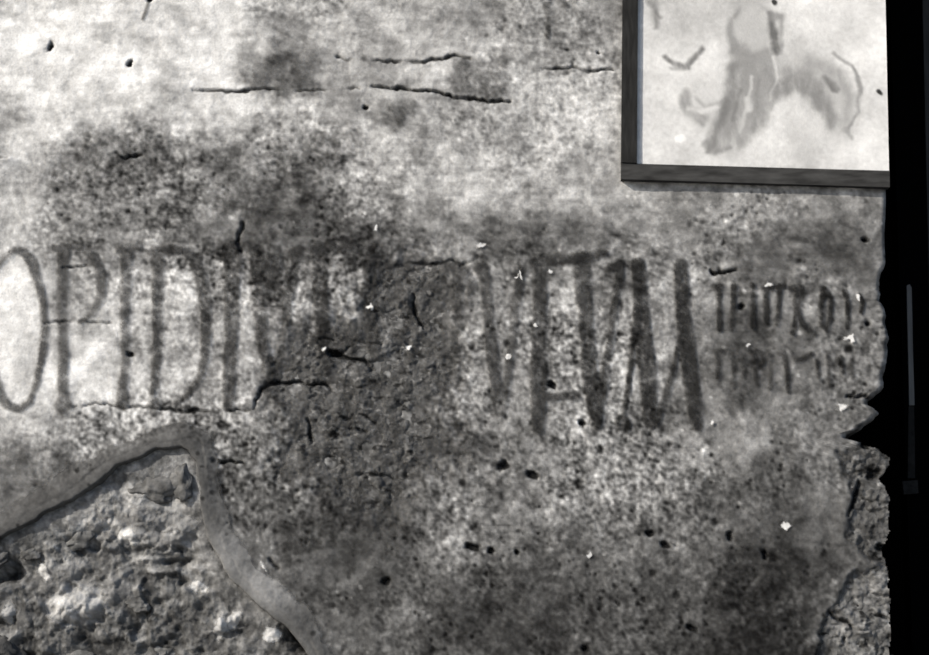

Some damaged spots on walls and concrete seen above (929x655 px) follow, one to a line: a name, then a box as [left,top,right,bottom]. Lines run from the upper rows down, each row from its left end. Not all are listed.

crack [397,89,503,103]
spalling [0,448,307,655]